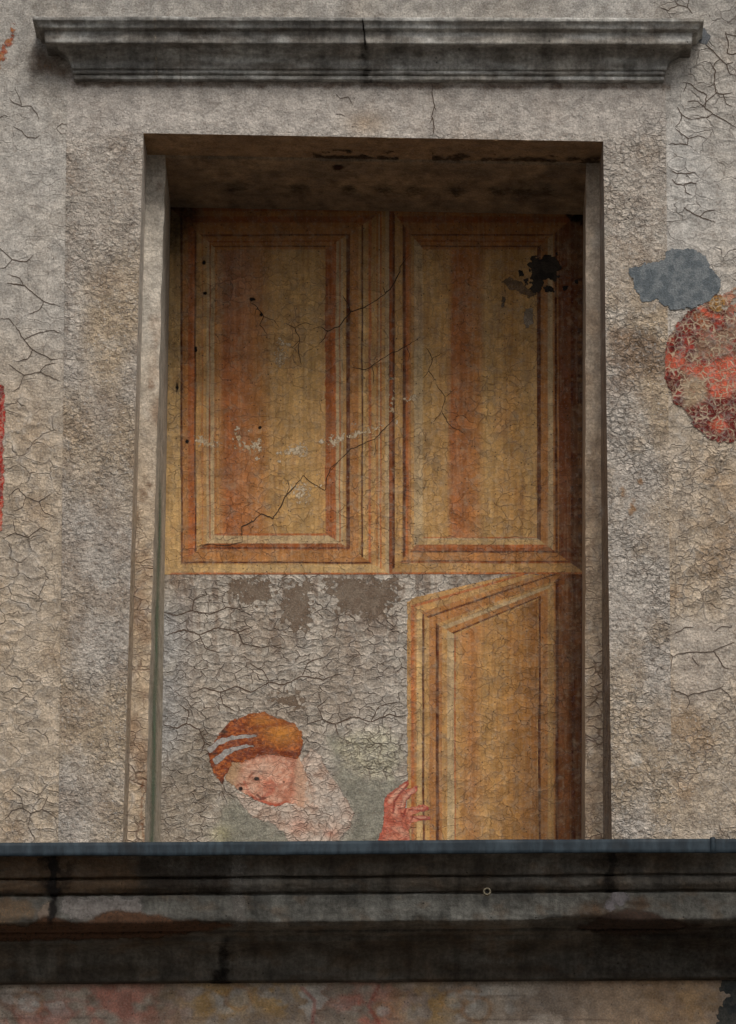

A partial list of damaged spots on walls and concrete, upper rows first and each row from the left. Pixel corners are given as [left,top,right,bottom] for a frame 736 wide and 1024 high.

crack [670,31,736,223]
crack [0,248,62,392]
crack [250,256,409,365]
peeling [501,252,578,328]
crack [353,337,463,433]
crack [3,488,55,550]
crack [200,417,397,546]
crack [165,594,406,754]
crack [7,789,54,836]
leakage [0,855,246,984]
leakage [603,853,629,911]